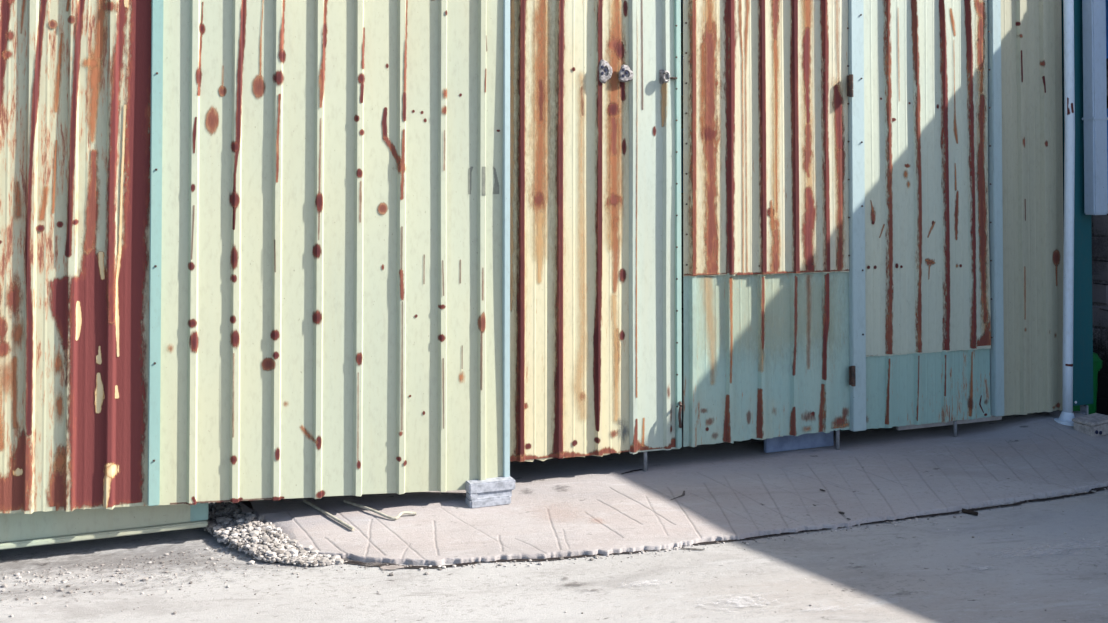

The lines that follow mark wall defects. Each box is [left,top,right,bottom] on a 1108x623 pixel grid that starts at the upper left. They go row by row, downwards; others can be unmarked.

corrosion [0,0,152,512]
corrosion [188,319,199,353]
corrosion [196,2,206,96]
corrosion [193,107,219,153]
corrosion [230,246,238,283]
corrosion [219,0,286,230]
corrosion [262,330,280,371]
corrosion [313,0,328,258]
corrosion [382,0,427,200]
corrosion [497,0,676,462]
corrosion [684,0,850,443]
corrosion [867,0,991,425]